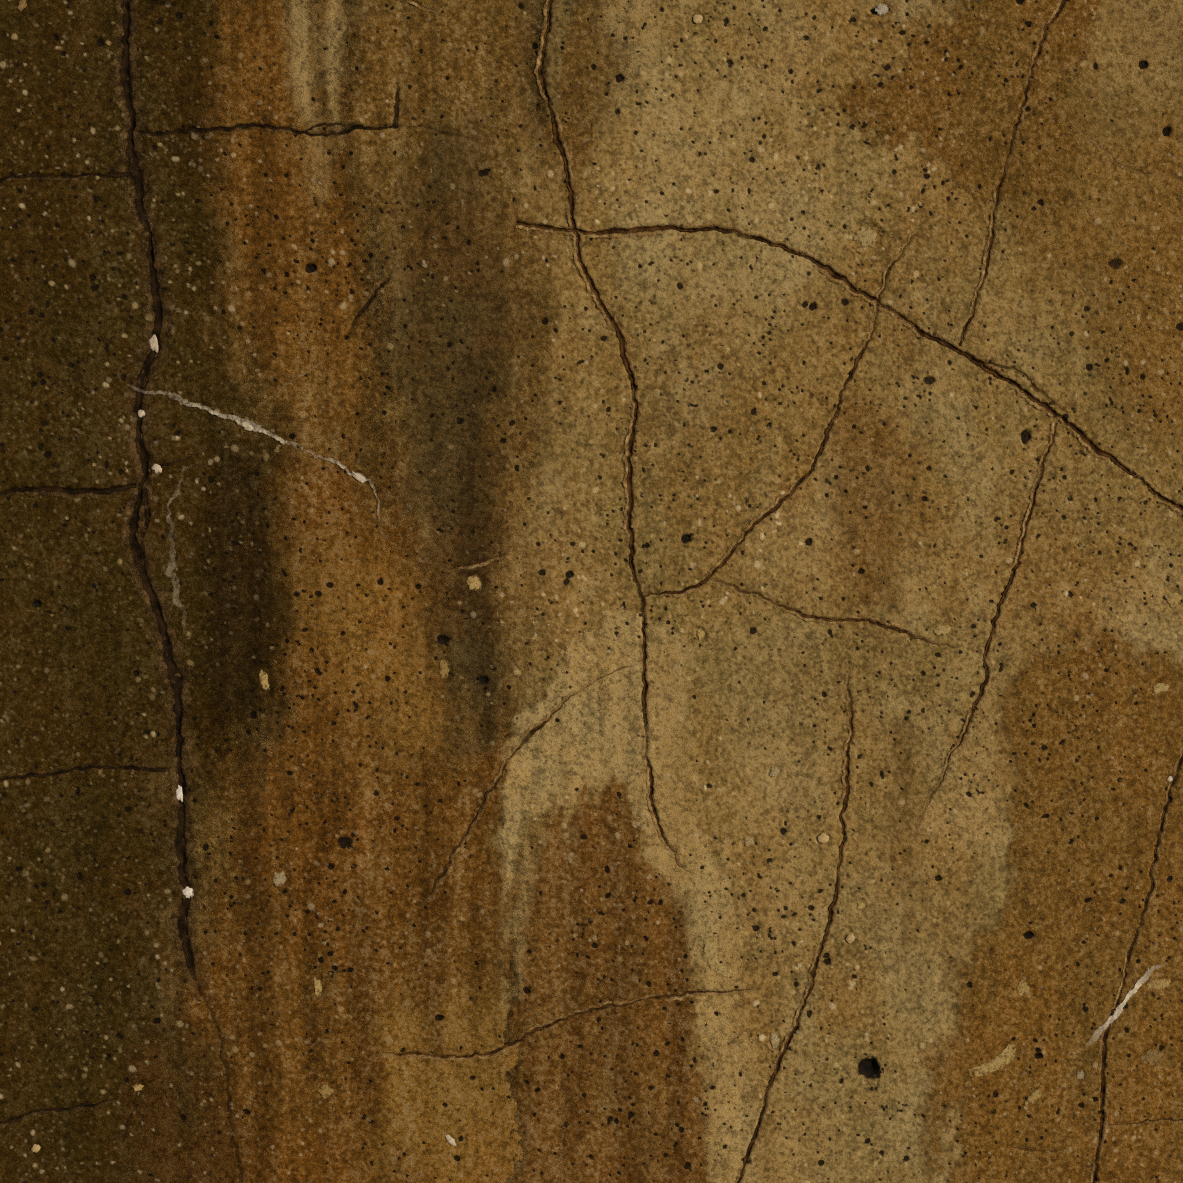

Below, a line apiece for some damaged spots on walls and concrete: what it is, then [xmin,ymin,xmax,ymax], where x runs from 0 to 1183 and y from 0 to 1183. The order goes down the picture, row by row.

crack [0,0,400,1183]
leakage [146,0,761,1183]
crack [457,556,496,569]
crack [432,692,579,892]
crack [394,989,737,1062]
crack [735,674,853,1183]
crack [516,0,1183,863]
crack [1091,745,1183,1183]